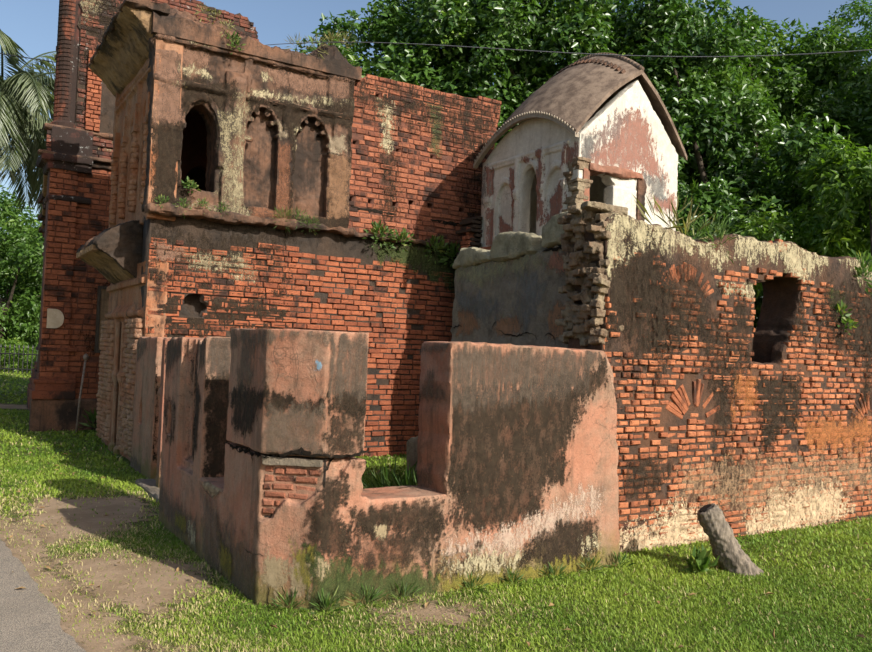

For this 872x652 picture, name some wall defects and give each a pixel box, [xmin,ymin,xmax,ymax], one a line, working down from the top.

damp [149,70,500,228]
peeling [485,166,515,246]
damp [581,134,596,158]
peeling [521,105,677,226]
damp [644,173,667,203]
damp [137,216,872,611]
spalling [262,454,327,518]